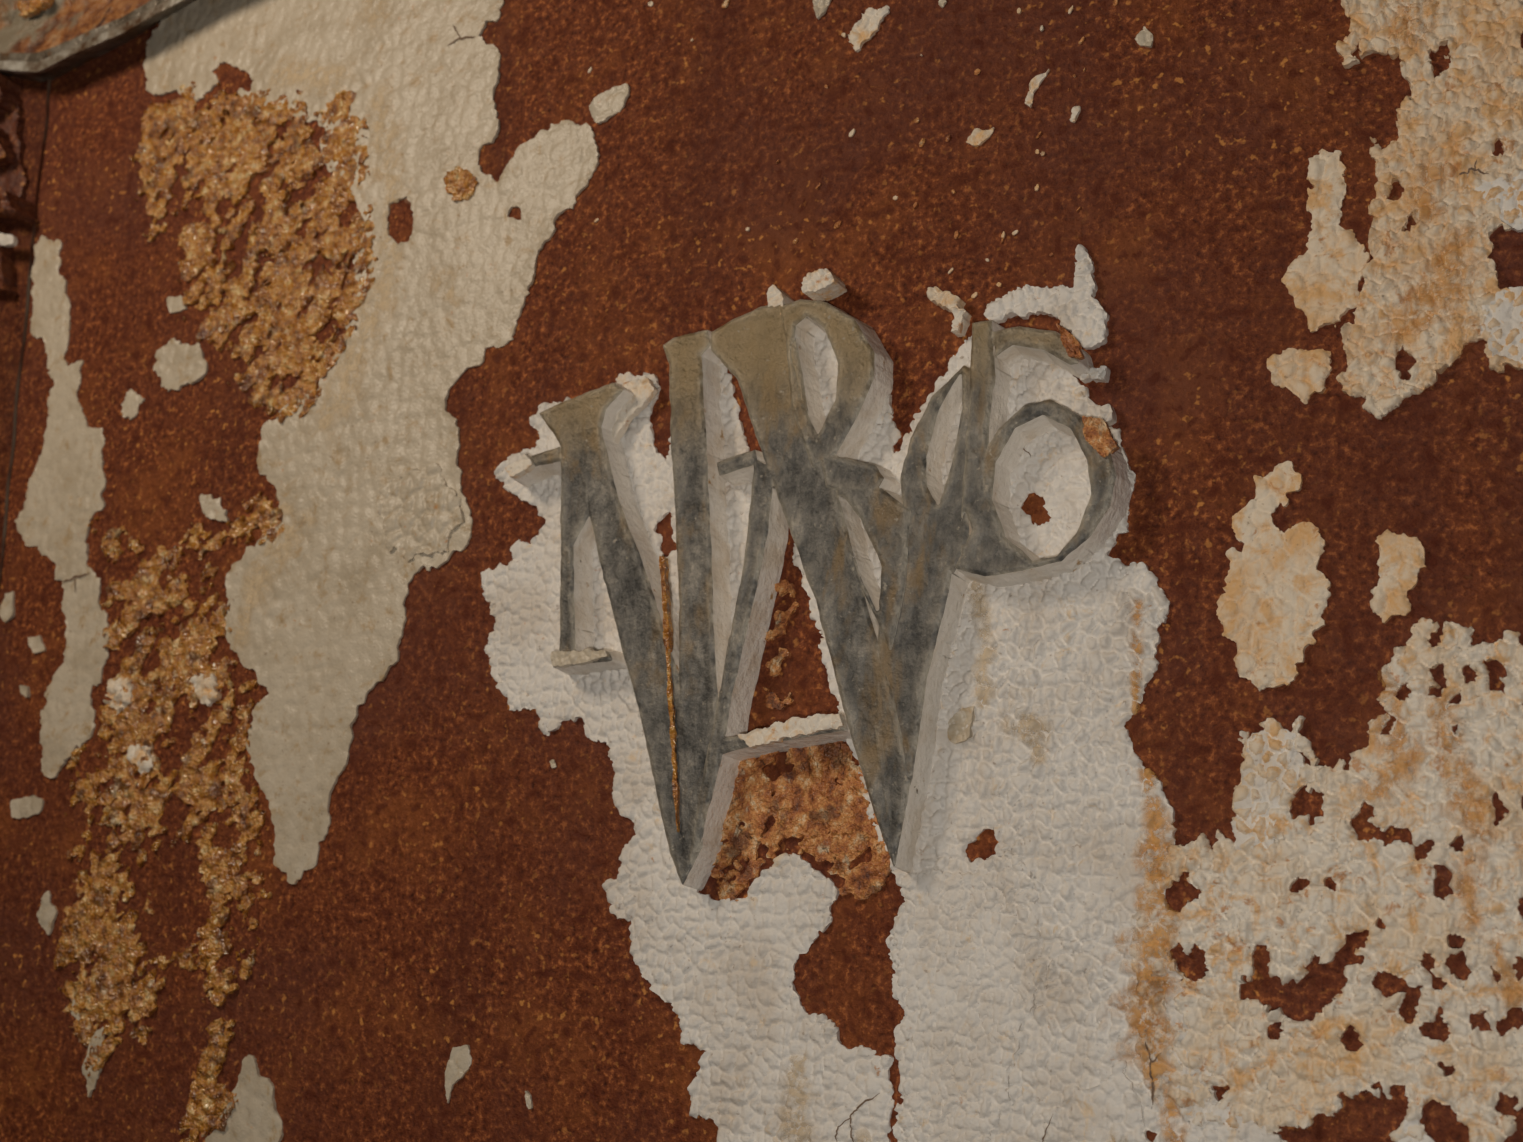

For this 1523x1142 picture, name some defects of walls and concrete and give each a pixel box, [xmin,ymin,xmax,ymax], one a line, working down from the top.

corrosion [130,81,382,423]
corrosion [443,166,479,202]
peeling [1267,0,1523,420]
peeling [0,233,109,779]
peeling [143,0,630,884]
corrosion [53,491,285,1142]
corrosion [659,556,680,832]
corrosion [711,741,892,901]
peeling [481,244,1523,1142]
peeling [205,1054,284,1142]
peeling [445,1045,472,1103]
crack [834,1094,878,1142]